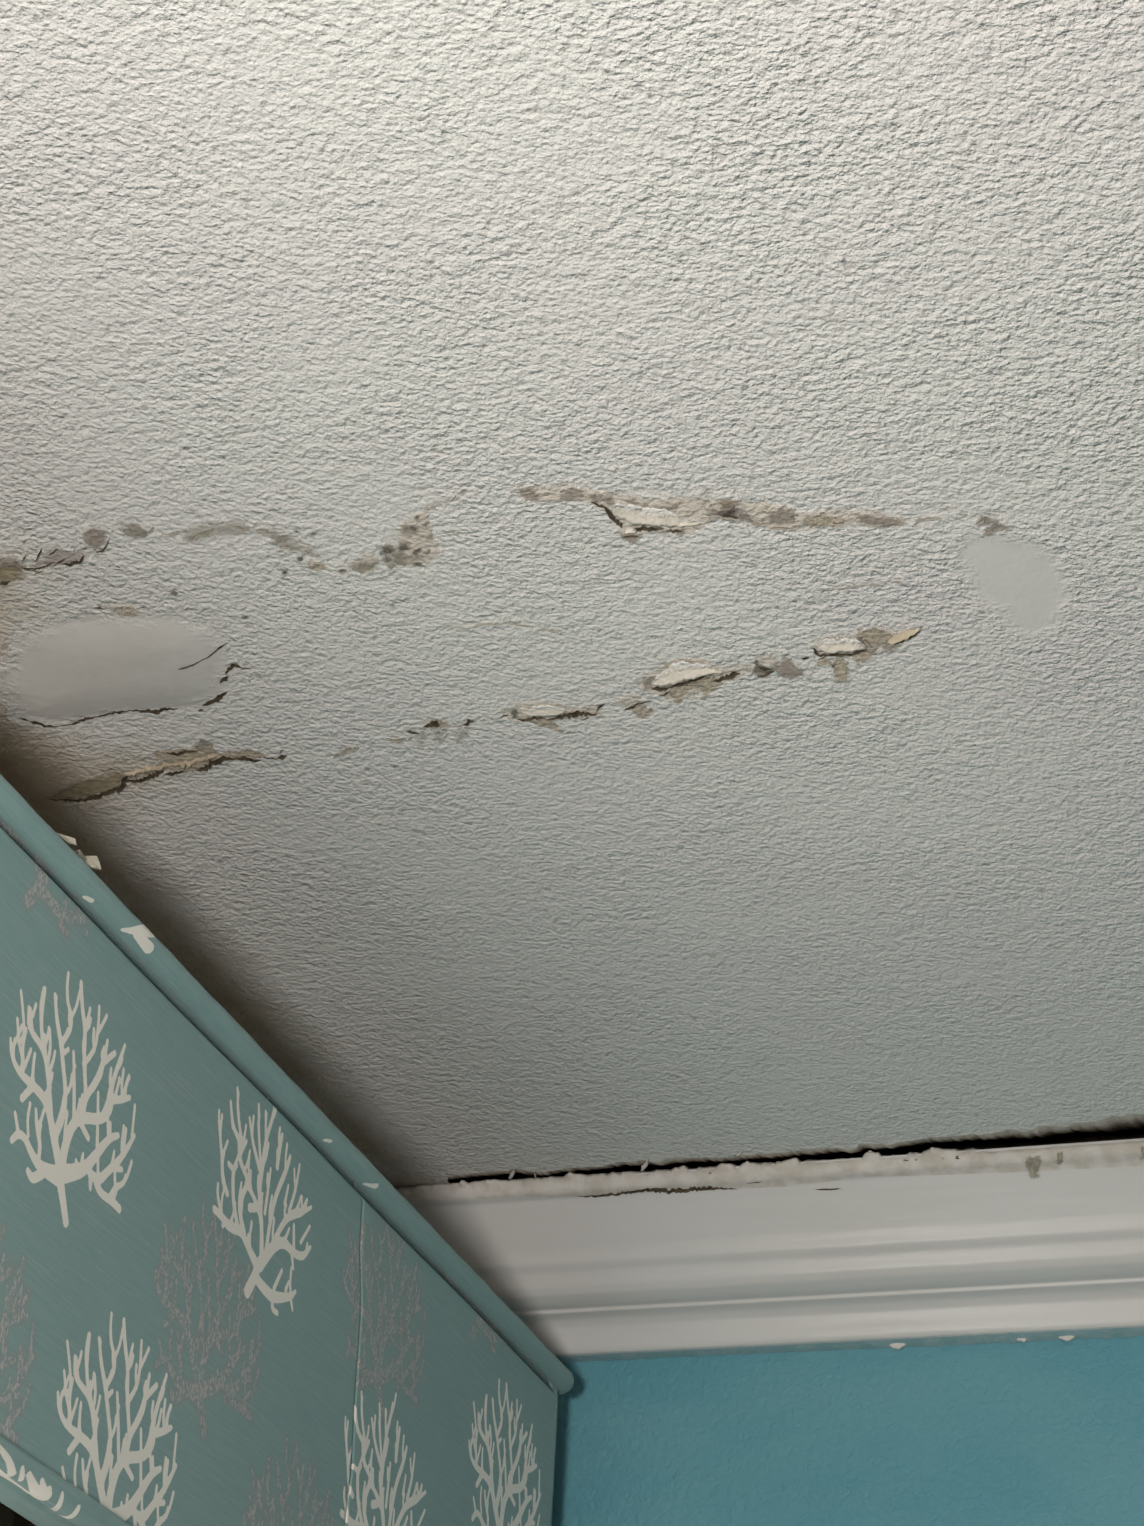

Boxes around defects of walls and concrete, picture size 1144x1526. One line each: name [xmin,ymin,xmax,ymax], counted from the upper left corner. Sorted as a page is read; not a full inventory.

spalling [0,490,468,585]
peeling [510,486,1009,543]
peeling [387,627,921,743]
crack [396,1114,1144,1202]